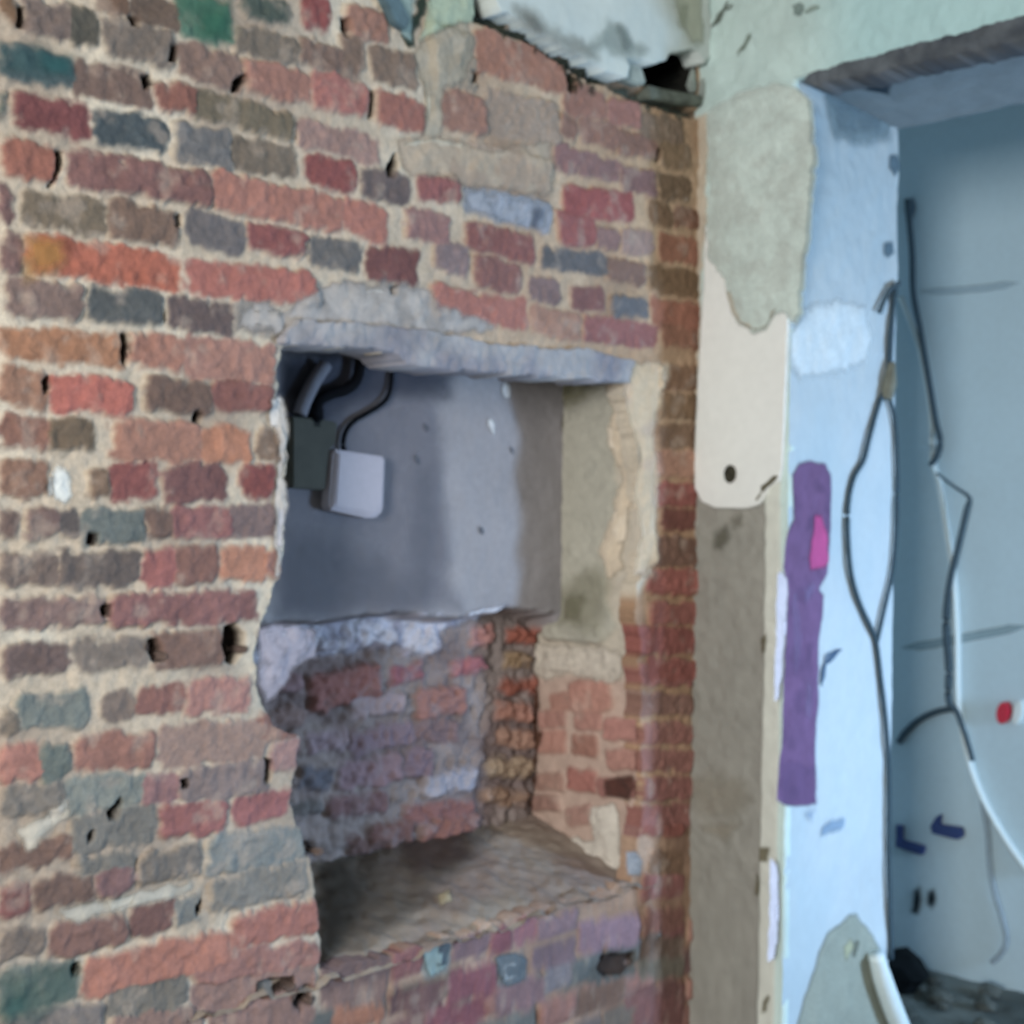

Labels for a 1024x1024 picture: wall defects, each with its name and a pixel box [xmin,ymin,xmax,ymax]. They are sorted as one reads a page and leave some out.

peeling [468,606,504,618]
peeling [221,625,316,699]